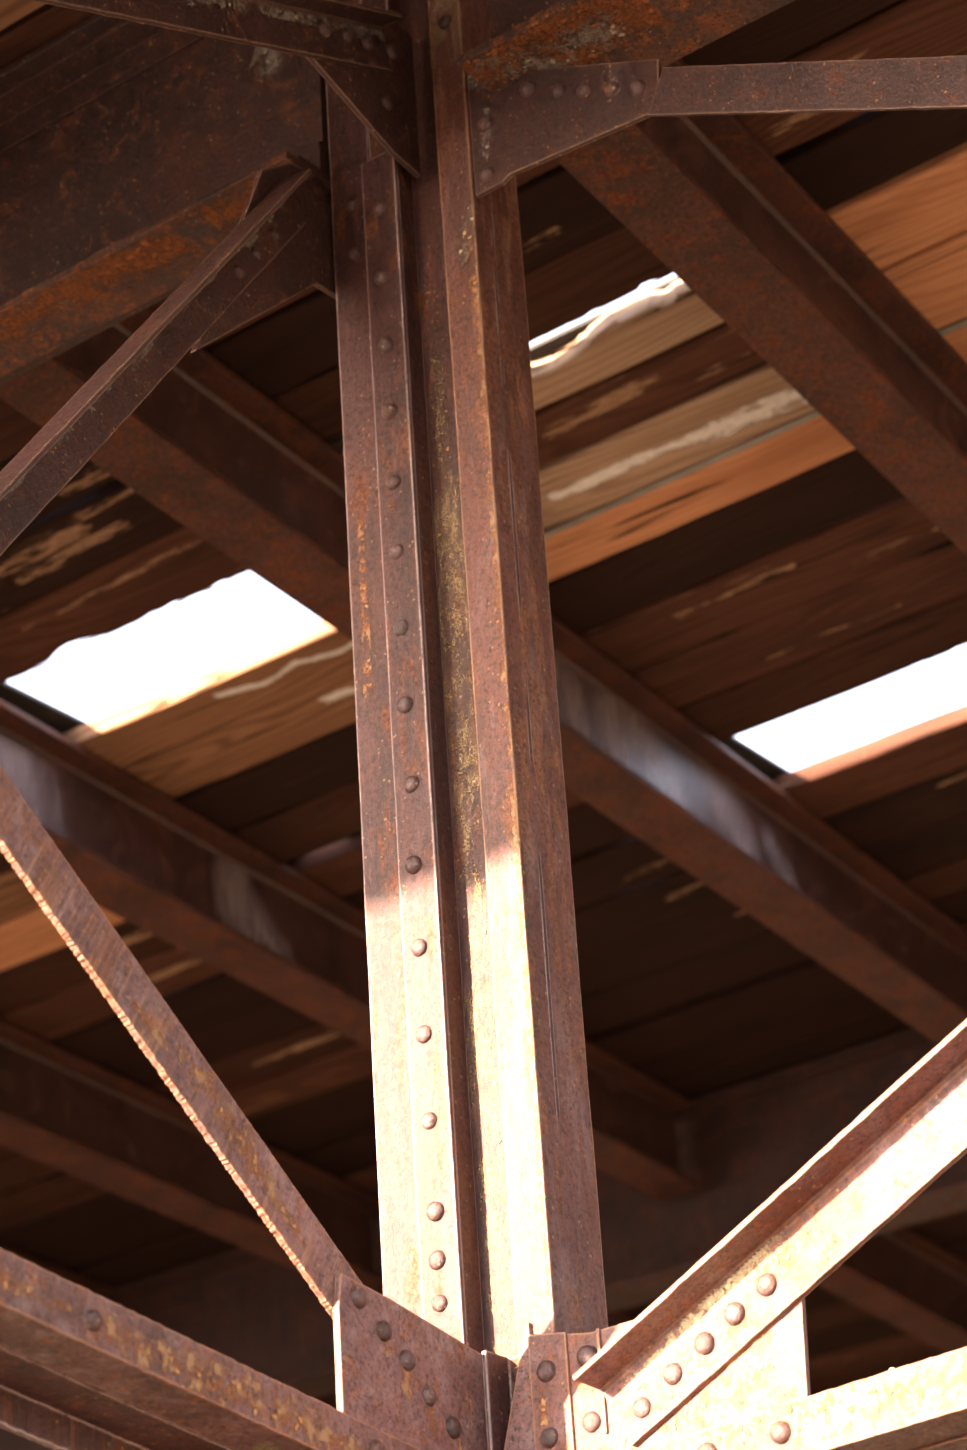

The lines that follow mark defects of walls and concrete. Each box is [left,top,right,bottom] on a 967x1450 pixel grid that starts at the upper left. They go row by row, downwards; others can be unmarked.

corrosion [357,520,372,698]